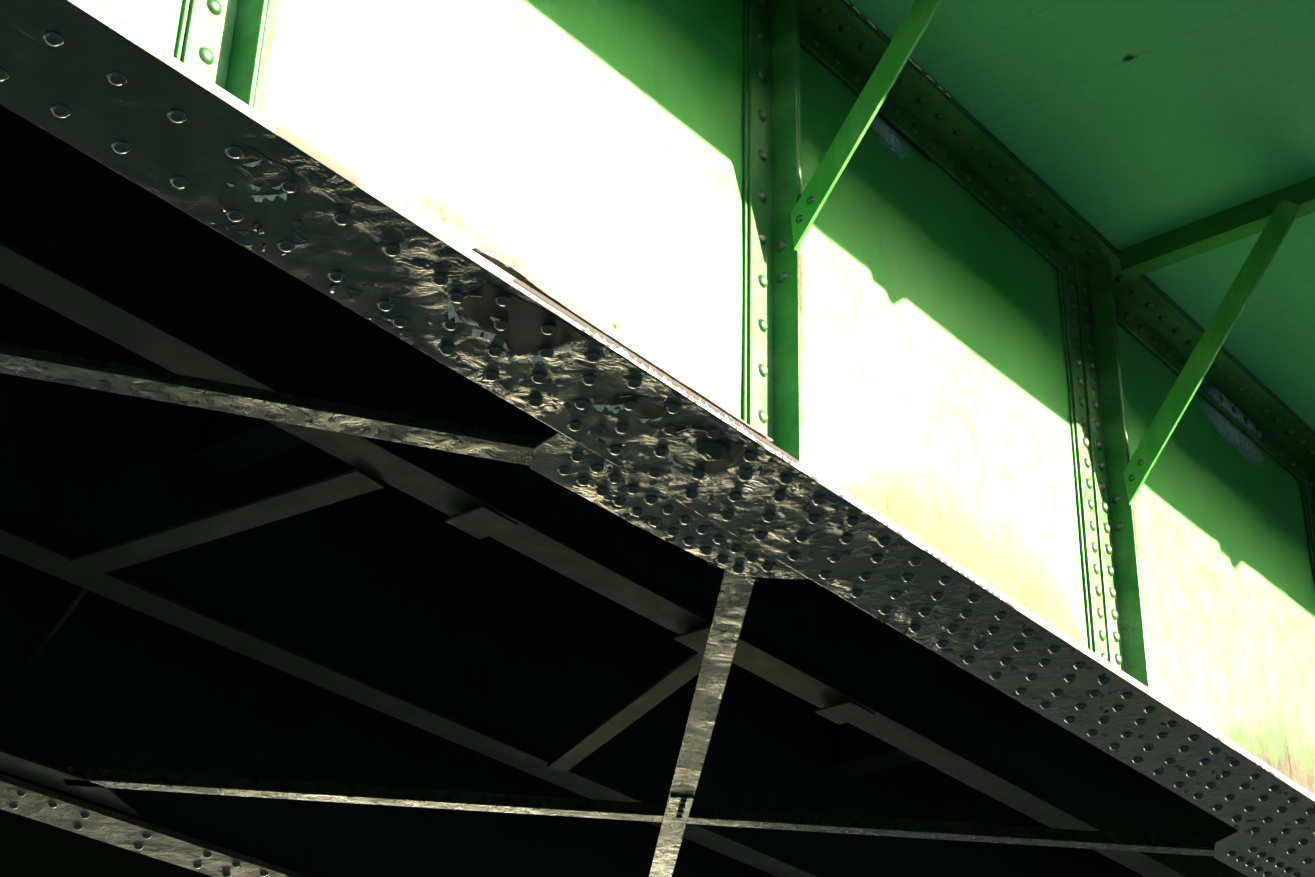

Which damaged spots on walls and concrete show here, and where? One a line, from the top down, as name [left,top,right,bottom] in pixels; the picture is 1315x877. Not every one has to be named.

peeling [227,147,295,205]
spalling [364,282,818,481]
peeling [835,494,904,551]
rust [1230,723,1315,795]